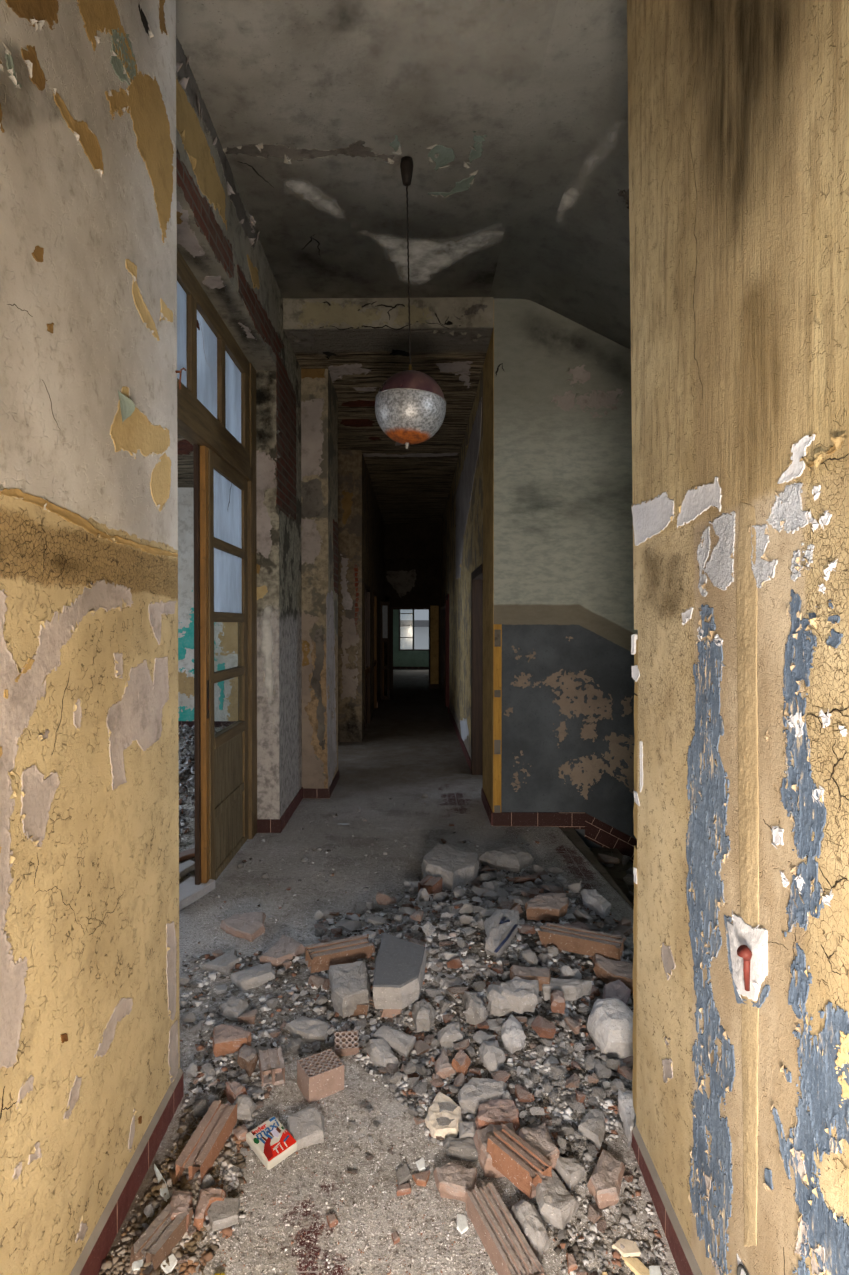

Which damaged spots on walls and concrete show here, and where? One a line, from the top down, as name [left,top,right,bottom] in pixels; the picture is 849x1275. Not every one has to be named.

peeling [0,0,104,177]
peeling [32,246,44,262]
peeling [77,0,402,791]
peeling [0,576,133,1068]
peeling [510,634,643,806]
peeling [631,430,849,1275]
crack [806,707,849,810]
peeling [166,921,179,1083]
peeling [63,1075,83,1119]